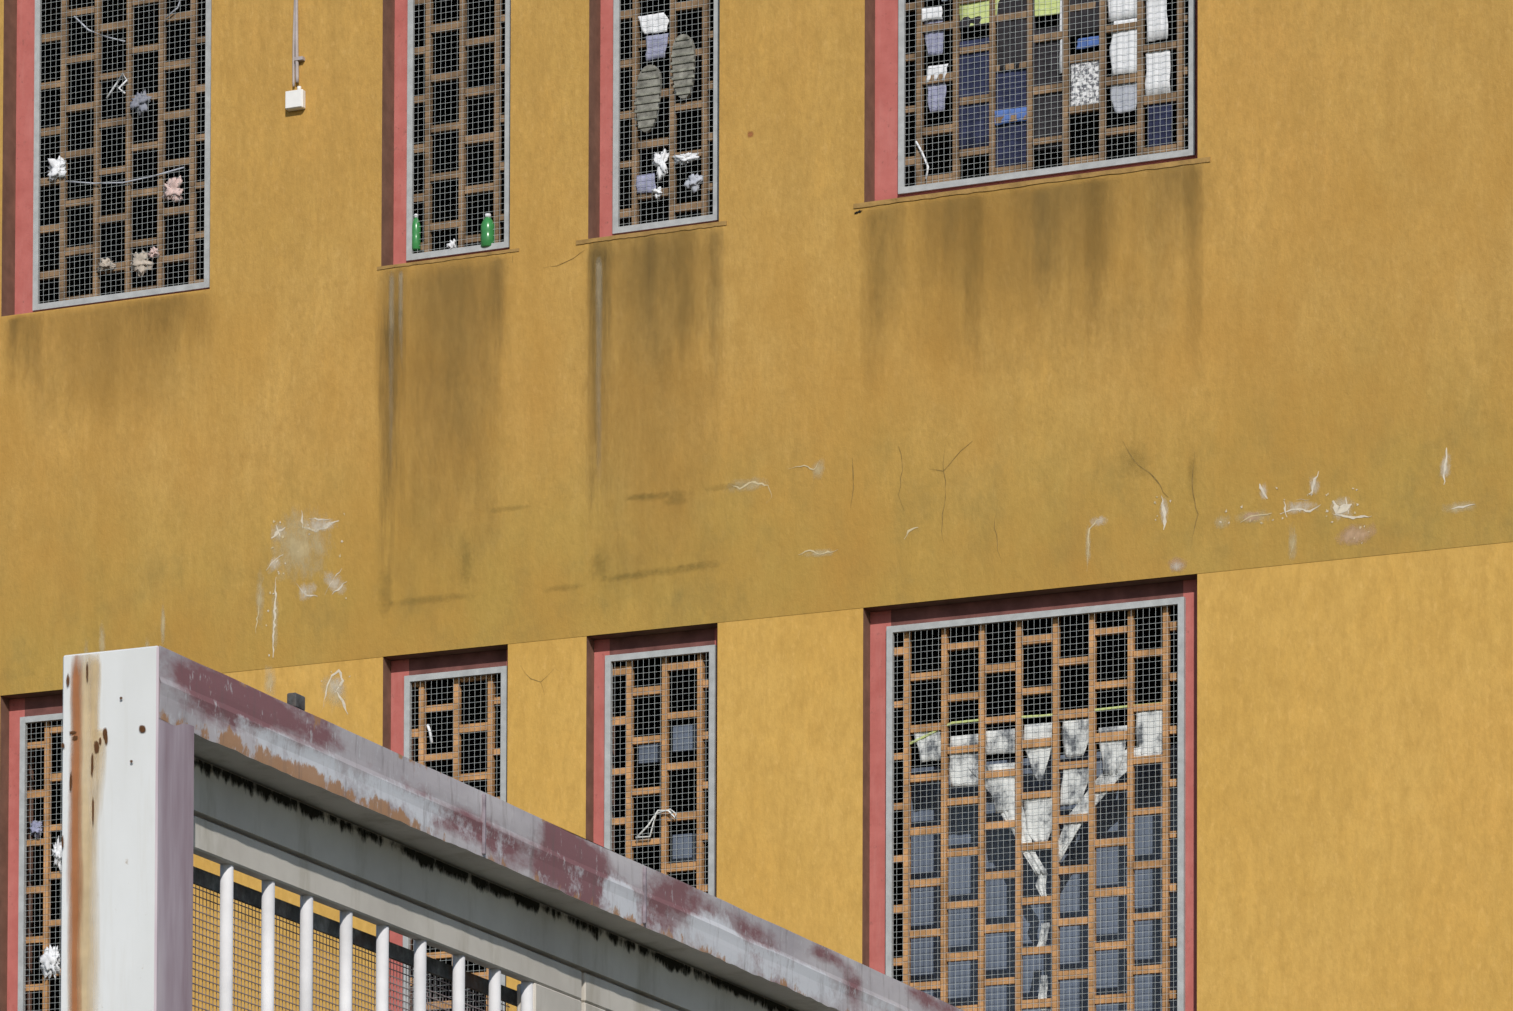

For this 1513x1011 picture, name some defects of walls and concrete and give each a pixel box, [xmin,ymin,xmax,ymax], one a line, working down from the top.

peeling [1219,471,1371,544]
peeling [255,510,347,657]